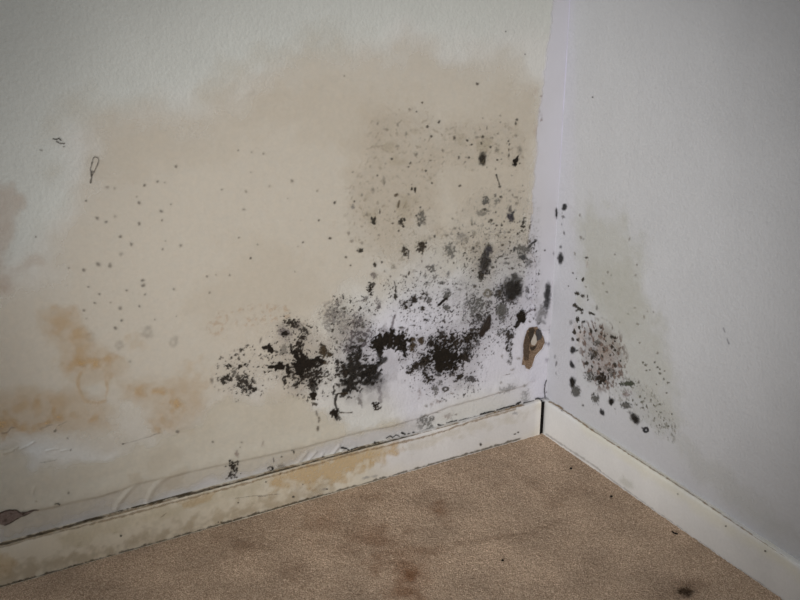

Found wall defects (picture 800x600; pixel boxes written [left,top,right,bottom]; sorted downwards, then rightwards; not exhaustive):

mould [458,136,521,167]
peeling [0,327,545,525]
water stain [0,174,550,545]
mould [568,286,669,433]